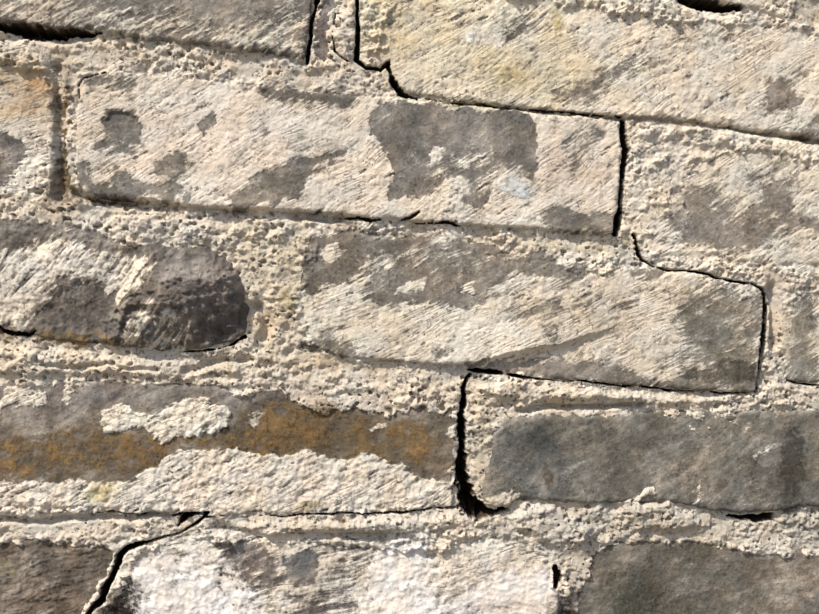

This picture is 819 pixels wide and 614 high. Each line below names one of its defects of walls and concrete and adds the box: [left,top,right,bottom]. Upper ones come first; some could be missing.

crack [0,21,103,42]
crack [242,0,767,520]
crack [184,335,247,352]
crack [87,510,223,614]
crack [552,564,562,588]